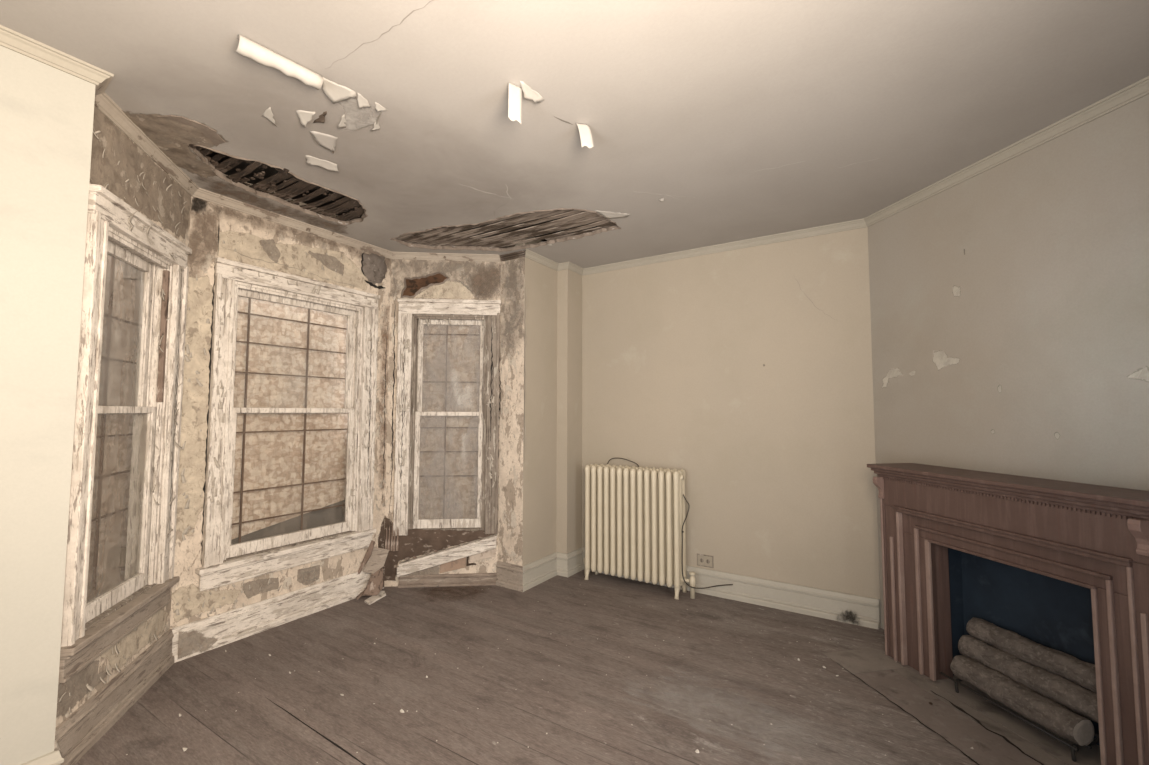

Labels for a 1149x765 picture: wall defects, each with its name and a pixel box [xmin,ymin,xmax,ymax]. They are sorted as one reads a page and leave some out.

crack [328,0,433,68]
peeling [235,34,387,172]
peeling [508,81,545,124]
peeling [555,117,594,148]
peeling [595,210,630,219]